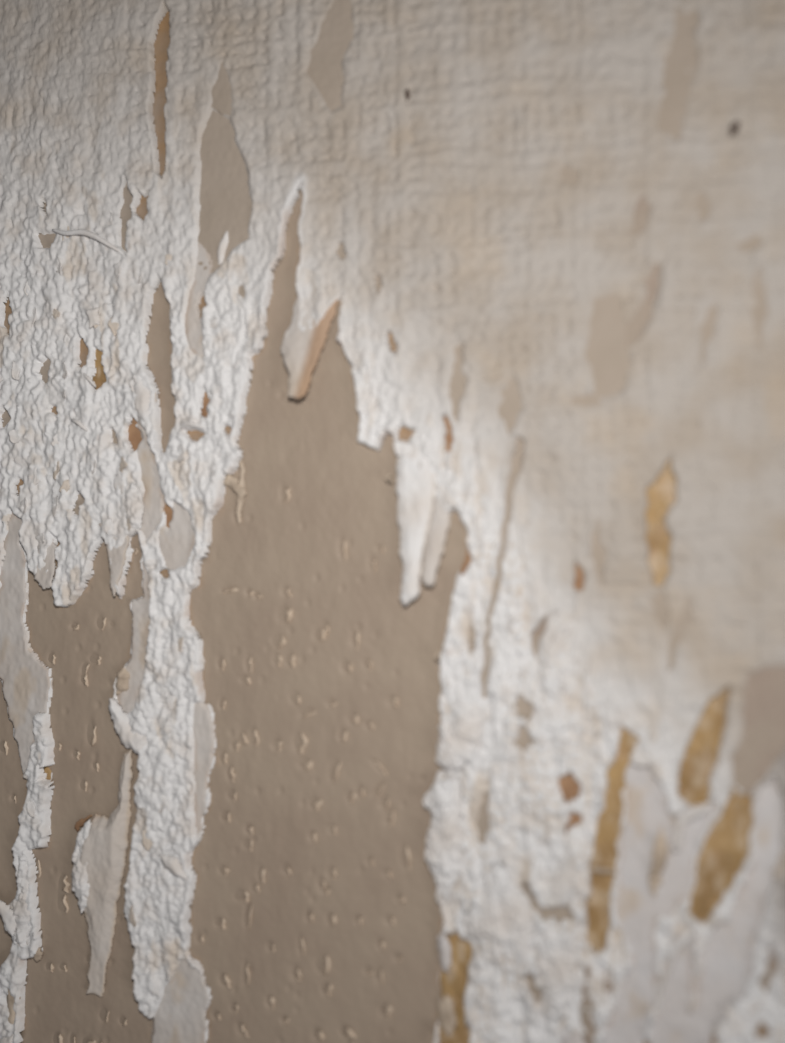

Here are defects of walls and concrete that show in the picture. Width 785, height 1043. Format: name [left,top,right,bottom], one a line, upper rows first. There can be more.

peeling [306,0,354,111]
peeling [185,62,252,358]
peeling [0,189,479,1043]
peeling [461,862,535,969]
peeling [561,667,785,1043]